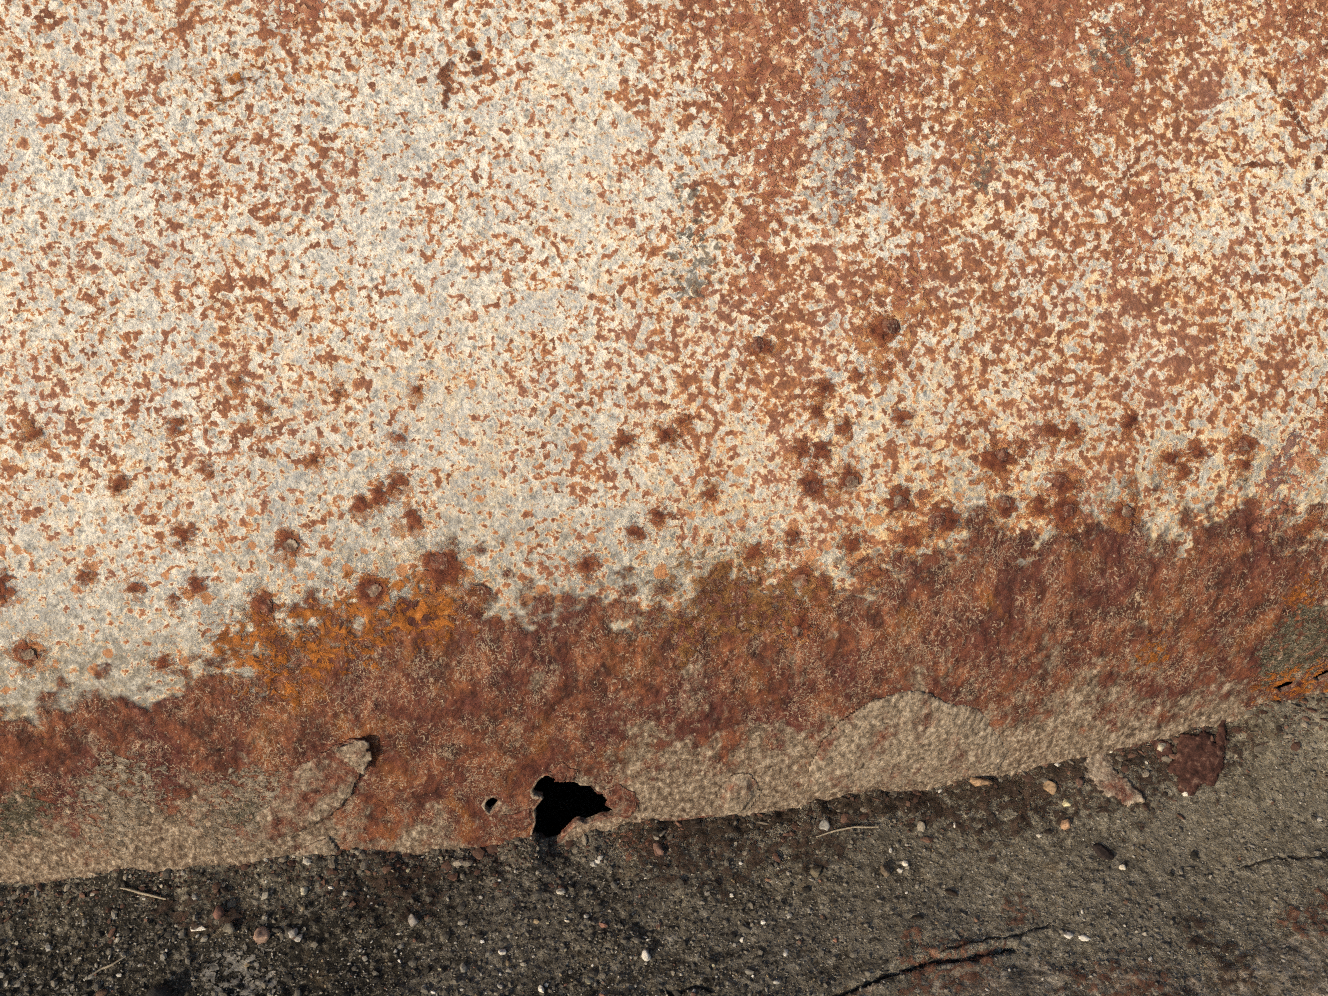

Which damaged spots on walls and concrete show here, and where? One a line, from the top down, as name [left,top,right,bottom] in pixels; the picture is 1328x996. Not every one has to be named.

rust [669,0,1328,501]
rust [0,403,1328,884]
peeling [548,763,577,782]
crack [1241,855,1328,868]
crack [667,986,710,995]
crack [833,923,1051,996]